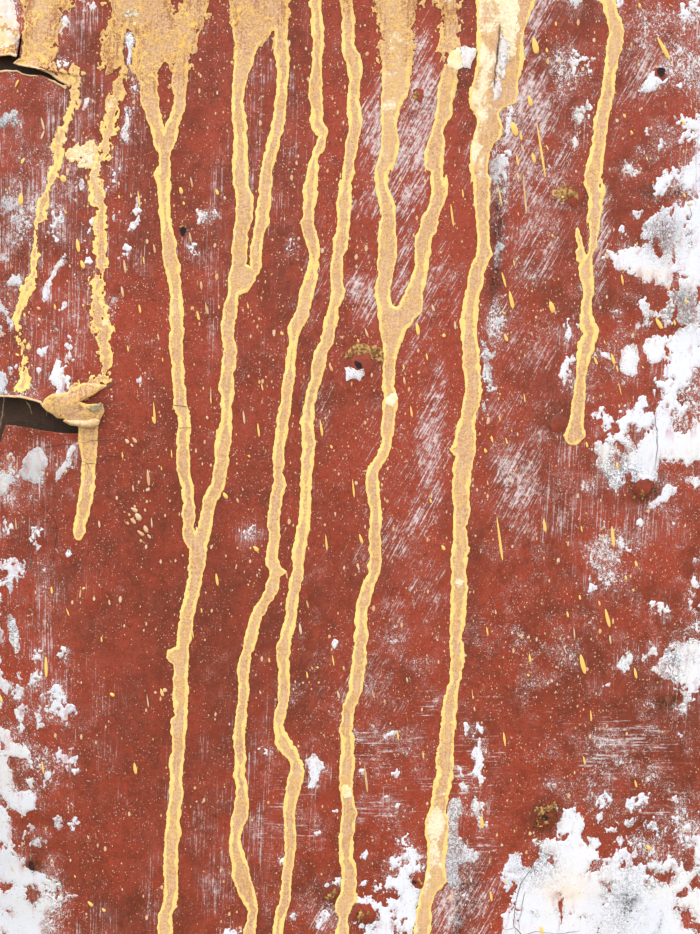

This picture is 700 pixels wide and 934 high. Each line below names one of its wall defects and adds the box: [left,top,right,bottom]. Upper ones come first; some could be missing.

peeling [0,0,20,54]
peeling [638,67,682,93]
peeling [112,196,142,231]
peeling [42,253,67,302]
peeling [589,113,700,510]
peeling [36,329,77,394]
peeling [558,318,579,386]
peeling [0,443,78,497]
peeling [0,557,26,654]
peeling [0,646,80,934]
crack [506,854,577,934]
peeling [498,790,700,934]